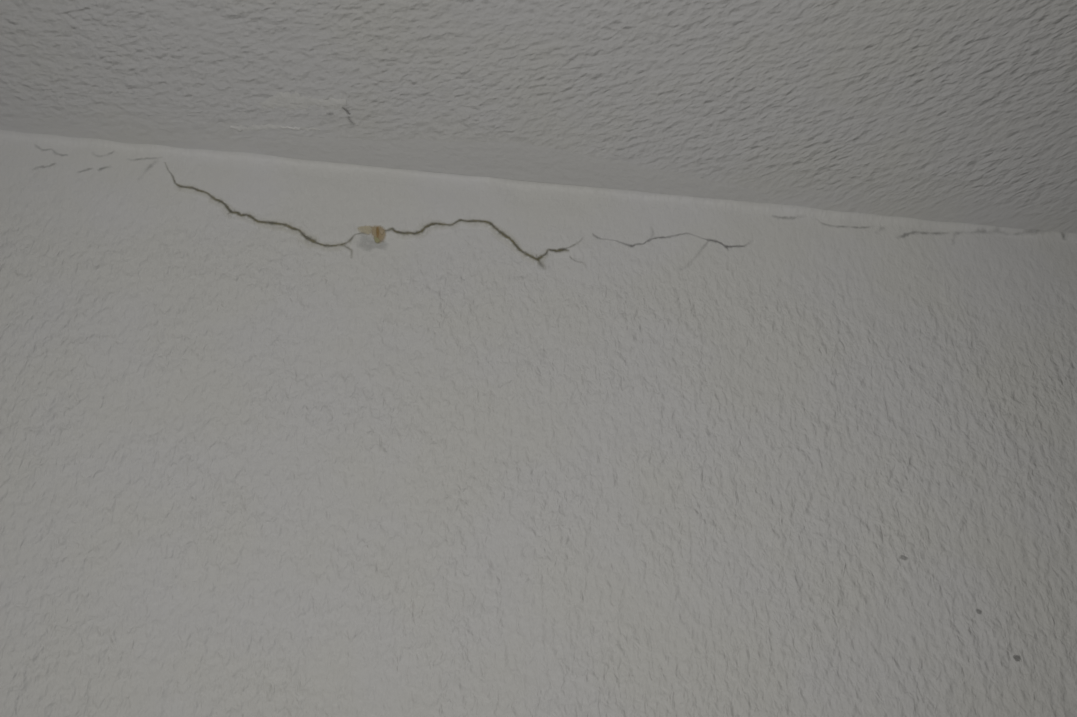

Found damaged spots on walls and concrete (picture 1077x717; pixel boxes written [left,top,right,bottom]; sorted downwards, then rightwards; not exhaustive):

crack [174,181,345,246]
crack [387,219,566,260]